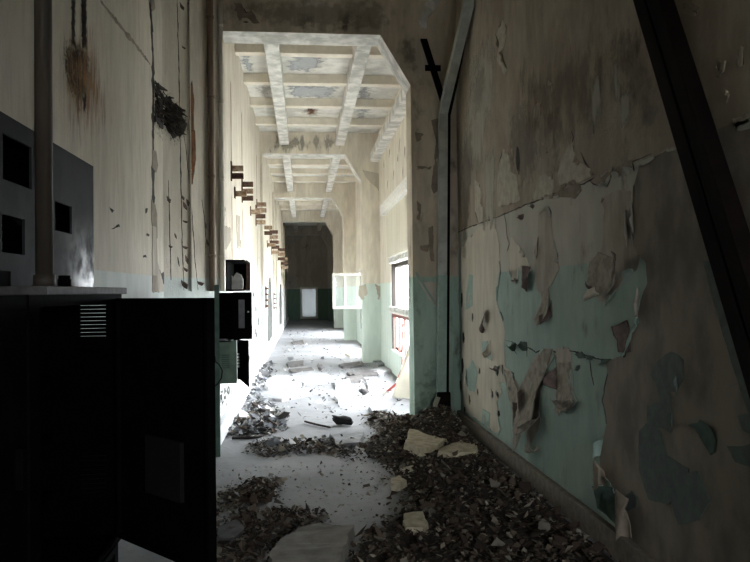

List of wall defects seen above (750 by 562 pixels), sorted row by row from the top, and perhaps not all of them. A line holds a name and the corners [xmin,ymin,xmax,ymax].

leakage [290,86,335,97]
leakage [270,137,304,152]
peeling [717,113,750,231]
crack [458,192,556,242]
peeling [456,131,750,562]